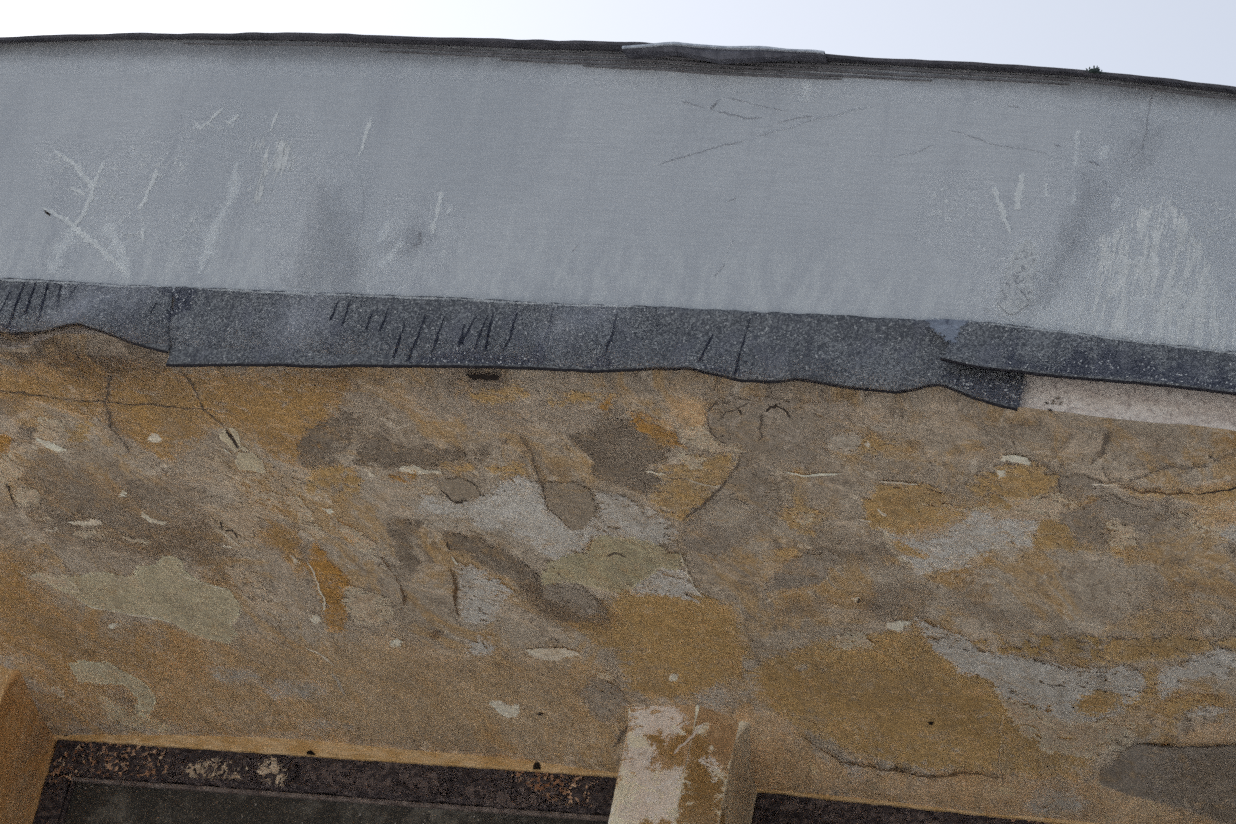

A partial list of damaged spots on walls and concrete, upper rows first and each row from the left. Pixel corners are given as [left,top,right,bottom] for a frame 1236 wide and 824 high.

leakage [247,110,296,208]
leakage [43,147,186,271]
leakage [931,173,1025,258]
leakage [393,308,554,365]
leakage [696,317,751,378]
leakage [941,197,1236,407]
crack [0,371,224,459]
crack [1090,434,1236,495]
peeling [0,335,1236,824]
crack [802,736,1007,783]